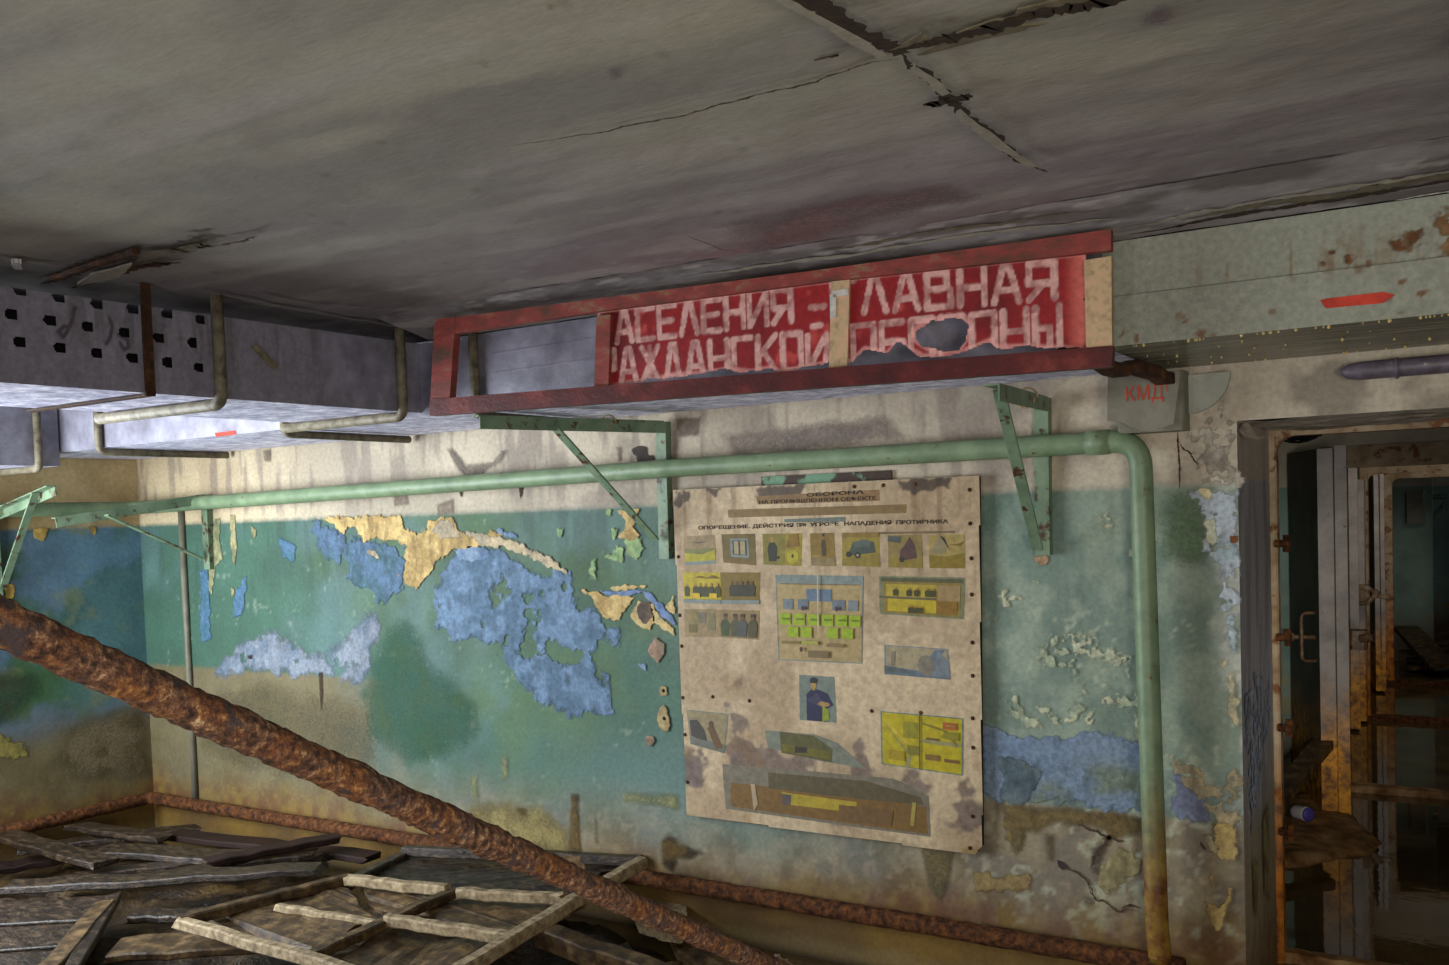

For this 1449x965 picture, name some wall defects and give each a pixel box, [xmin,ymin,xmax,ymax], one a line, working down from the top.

crack [509,0,1126,172]
crack [0,236,394,327]
peeling [199,515,256,642]
peeling [214,509,675,719]
peeling [1187,406,1244,726]
flaking render [645,686,670,746]
crack [1058,824,1137,913]
peeling [1170,755,1244,931]